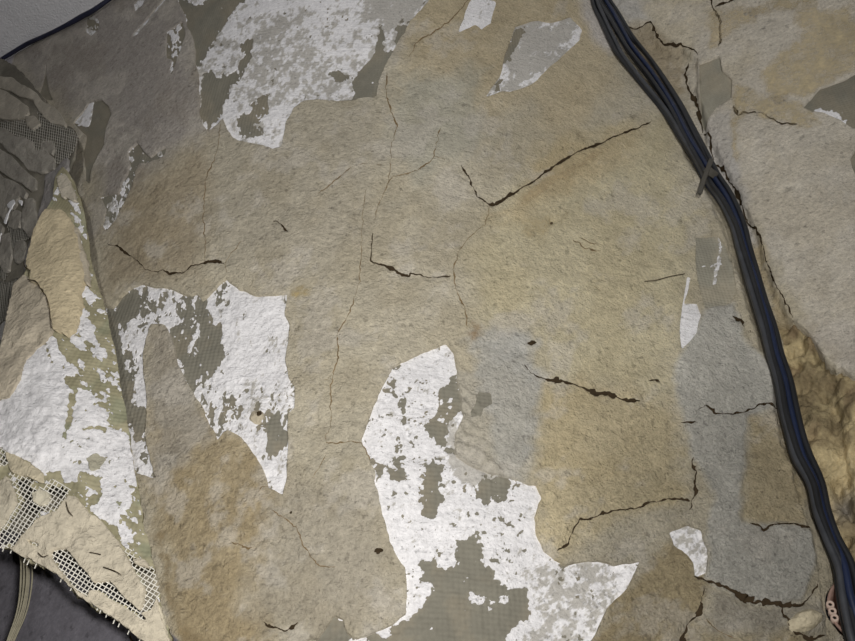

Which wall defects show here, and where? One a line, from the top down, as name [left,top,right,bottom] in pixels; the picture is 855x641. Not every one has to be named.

crack [107,128,240,275]
peeling [167,0,429,149]
peeling [459,0,496,32]
crack [314,75,650,475]
peeling [487,17,582,96]
crack [629,21,796,318]
crack [711,0,733,46]
peeling [803,75,855,128]
peeling [0,59,295,641]
crack [681,402,777,424]
peeling [318,345,639,641]
crack [557,457,699,551]